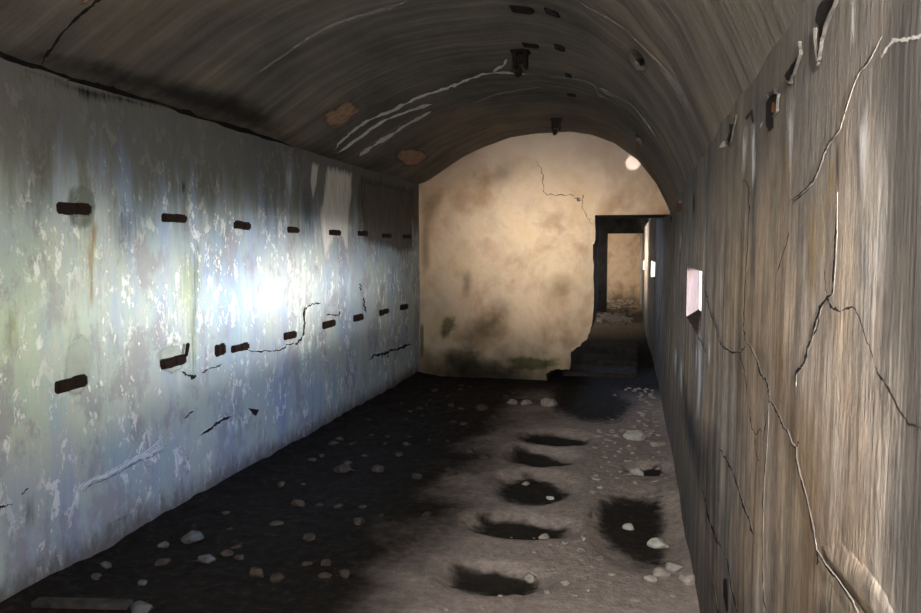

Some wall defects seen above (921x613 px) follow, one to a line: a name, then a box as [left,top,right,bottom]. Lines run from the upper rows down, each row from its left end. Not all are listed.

spalling [813,0,839,67]
water stain [91,67,268,128]
water stain [324,100,359,127]
spalling [719,41,803,148]
crack [790,37,882,202]
crack [537,161,593,225]
crack [182,364,221,380]
crack [184,411,232,436]
crack [248,303,341,353]
crack [371,343,411,359]
crack [698,180,859,613]
crack [794,192,921,428]